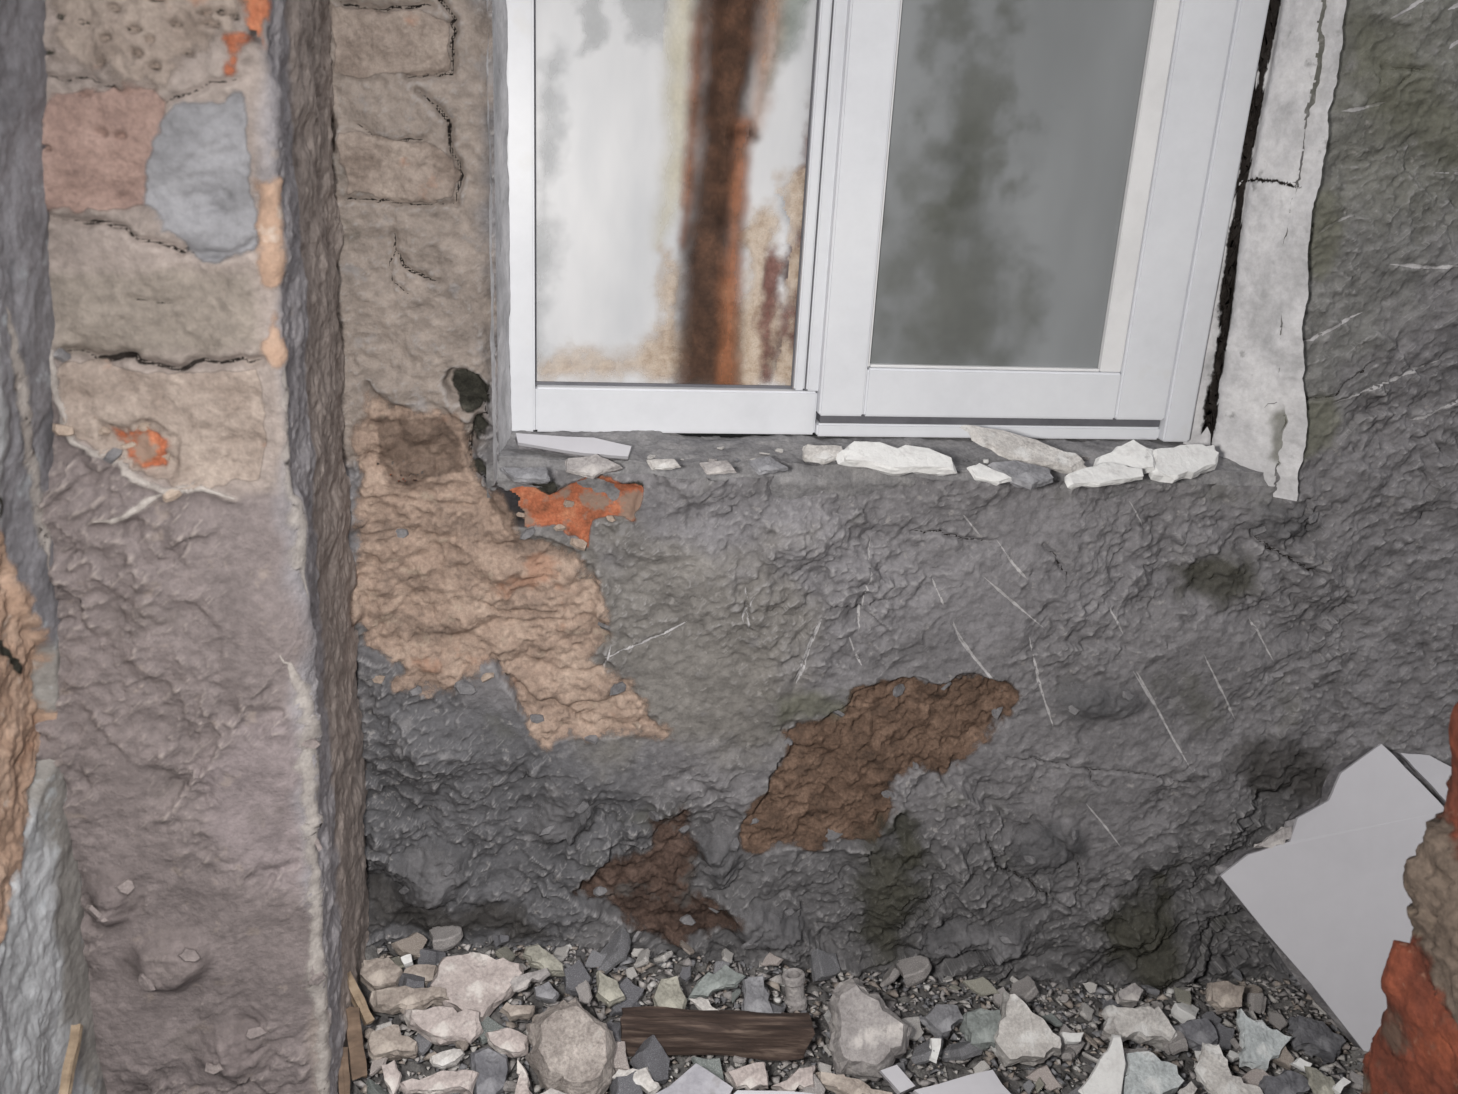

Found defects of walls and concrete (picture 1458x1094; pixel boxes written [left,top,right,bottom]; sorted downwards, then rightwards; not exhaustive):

flaking render [42,0,272,213]
flaking render [330,5,451,79]
rust [542,0,806,388]
damp [767,0,808,83]
crack [1202,0,1302,446]
flaking render [49,317,309,597]
flaking render [350,393,681,750]
peeling [0,497,57,944]
spalling [400,954,413,968]
flaking render [572,809,744,947]
flaking render [738,673,1019,854]
spalling [1215,702,1458,1094]